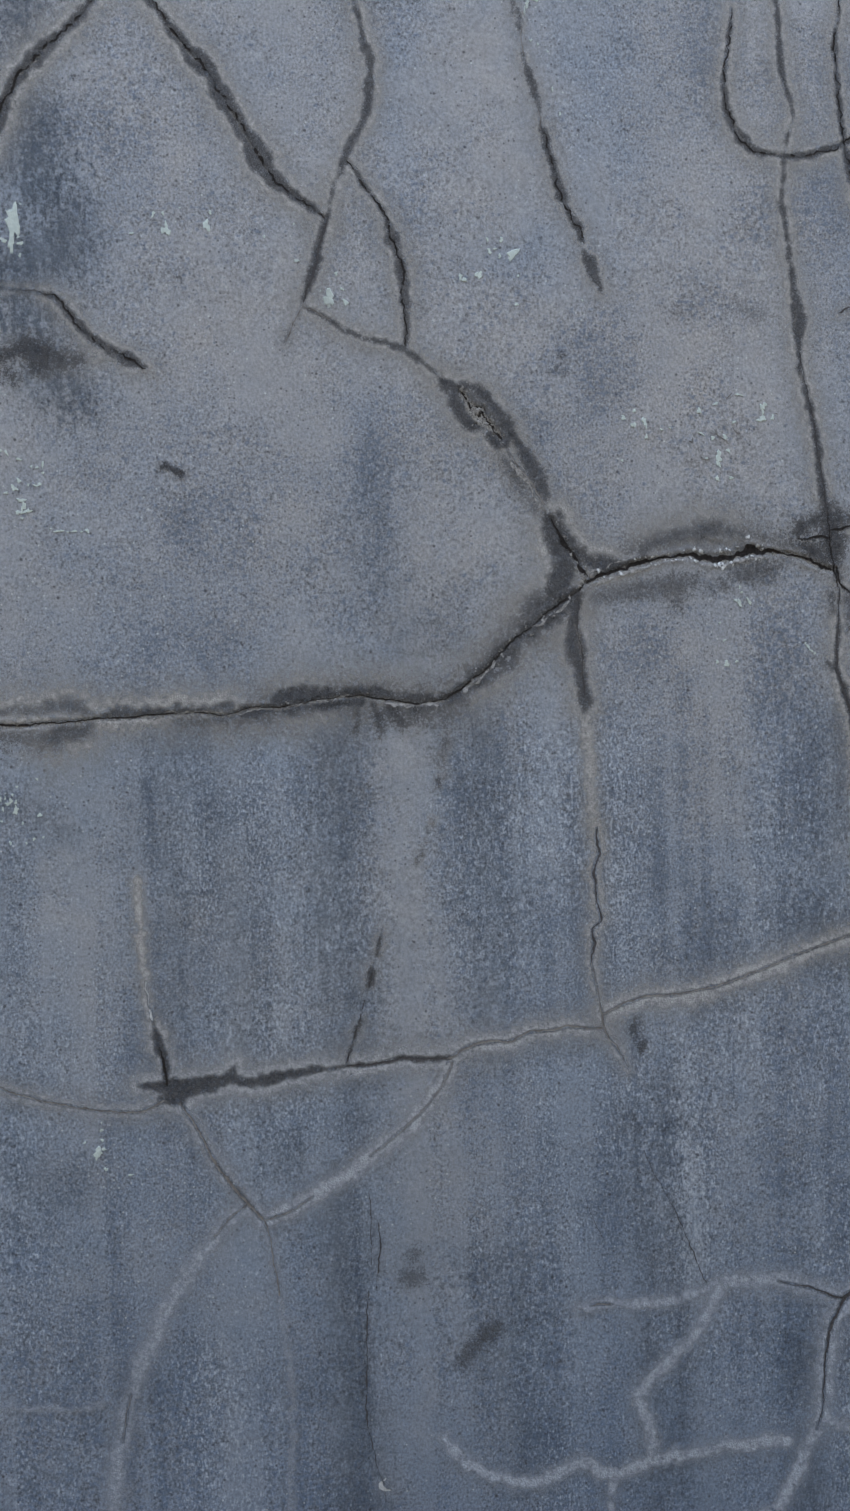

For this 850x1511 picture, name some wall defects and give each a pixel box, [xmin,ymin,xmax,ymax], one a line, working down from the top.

crack [0,0,850,772]
leakage [558,583,600,830]
crack [0,820,850,1511]